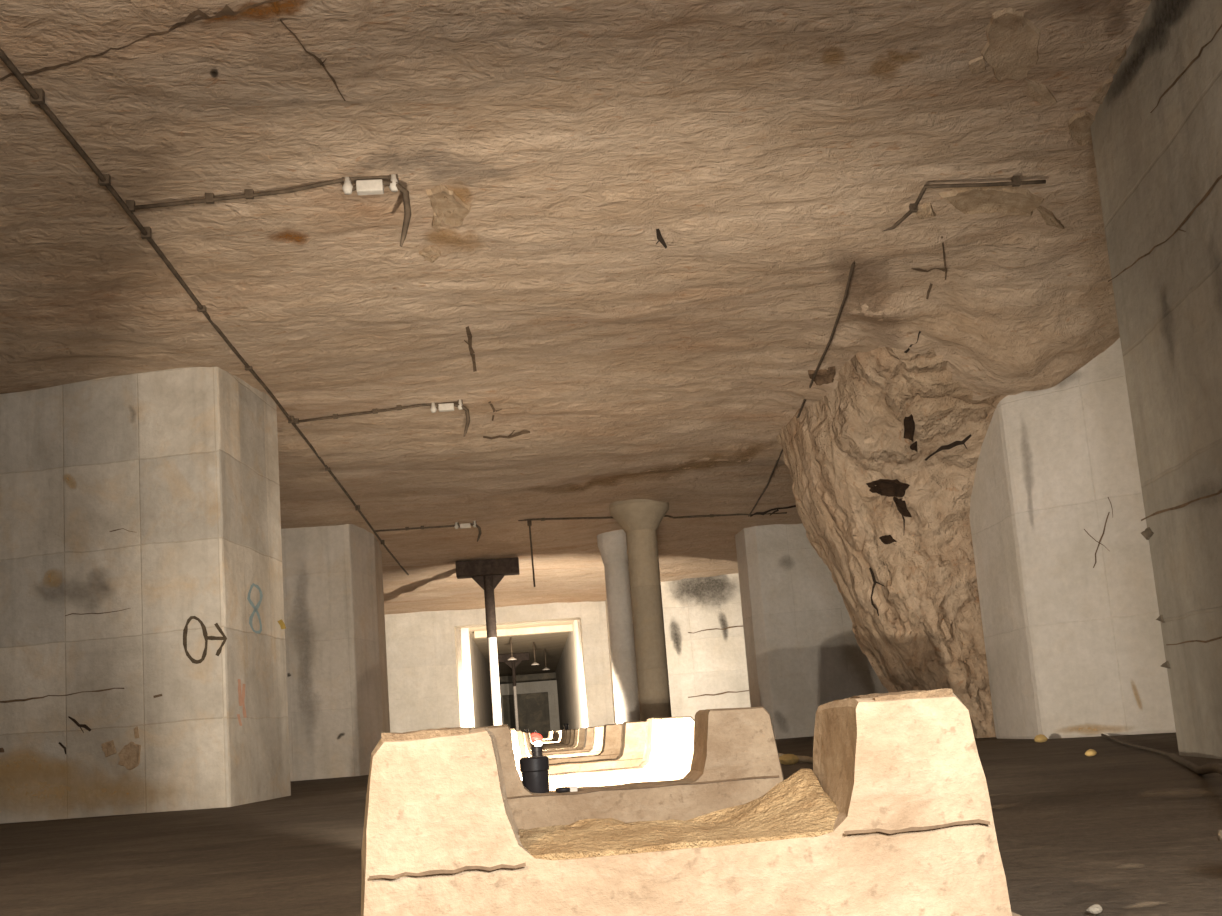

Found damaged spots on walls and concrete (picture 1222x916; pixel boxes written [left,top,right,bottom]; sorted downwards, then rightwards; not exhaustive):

crack [0,0,346,101]
water stain [1118,0,1188,84]
crack [1150,24,1222,113]
crack [1108,175,1222,282]
spalling [903,414,917,452]
spalling [879,535,897,544]
spalling [866,479,912,517]
crack [1084,489,1222,568]
water stain [677,576,730,601]
crack [1166,636,1222,645]
crack [0,688,124,754]